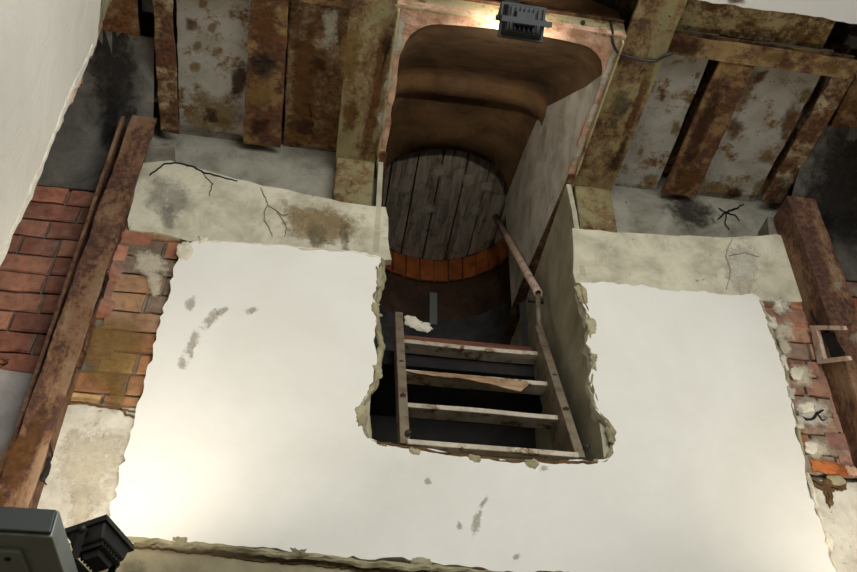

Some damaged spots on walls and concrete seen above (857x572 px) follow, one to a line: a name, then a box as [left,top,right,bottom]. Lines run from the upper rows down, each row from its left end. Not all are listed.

flaking render [0,0,112,374]
leakage [102,95,118,146]
crack [149,162,238,196]
crack [261,189,294,237]
rust [286,9,326,135]
rust [342,24,393,152]
rust [610,70,650,169]
rust [675,82,723,191]
crack [717,204,759,290]
flaking render [69,222,271,409]
flaking render [282,245,617,469]
flaking render [759,300,857,572]